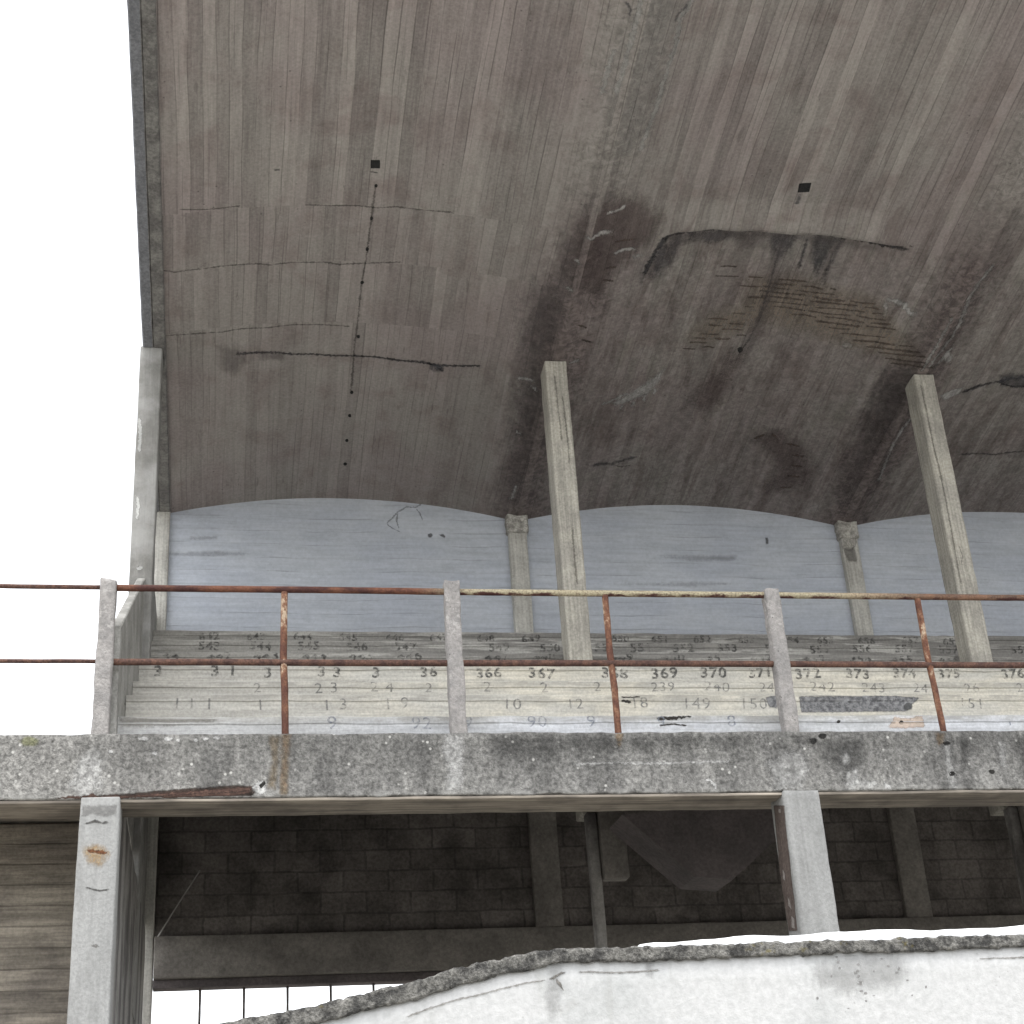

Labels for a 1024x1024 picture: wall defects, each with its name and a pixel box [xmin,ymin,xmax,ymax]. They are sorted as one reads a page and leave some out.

crack [643,229,714,274]
crack [831,236,912,250]
crack [164,184,481,466]
spalling [683,265,933,368]
crack [963,375,1024,392]
rust [269,735,289,794]
rust [85,845,107,866]